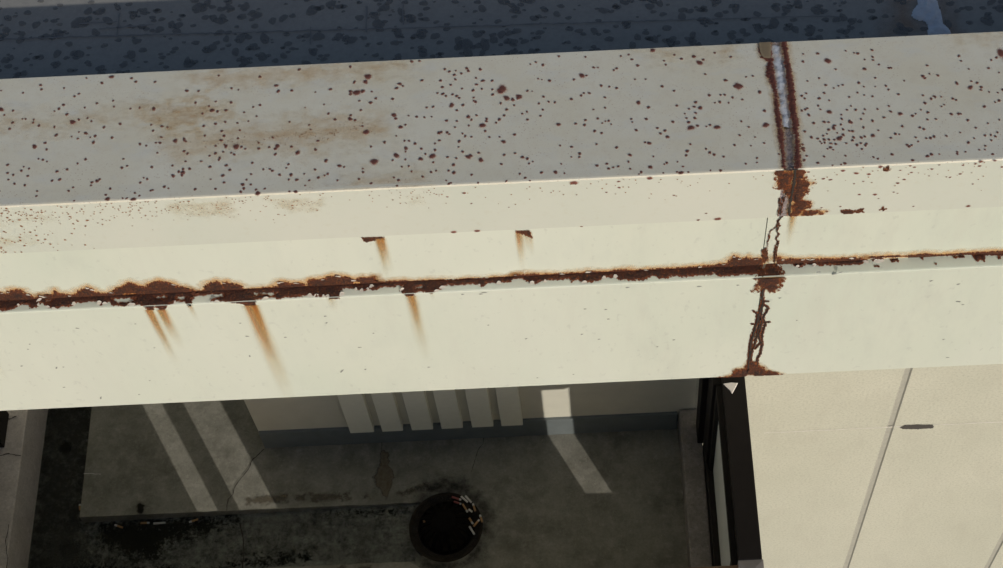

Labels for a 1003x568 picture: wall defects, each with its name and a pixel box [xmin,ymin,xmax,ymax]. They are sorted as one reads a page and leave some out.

corrosion [0,87,345,253]
corrosion [362,237,385,252]
corrosion [383,67,556,204]
corrosion [595,143,691,193]
crack [767,170,797,263]
corrosion [708,42,1003,220]
corrosion [0,248,1003,343]
crack [747,288,771,370]